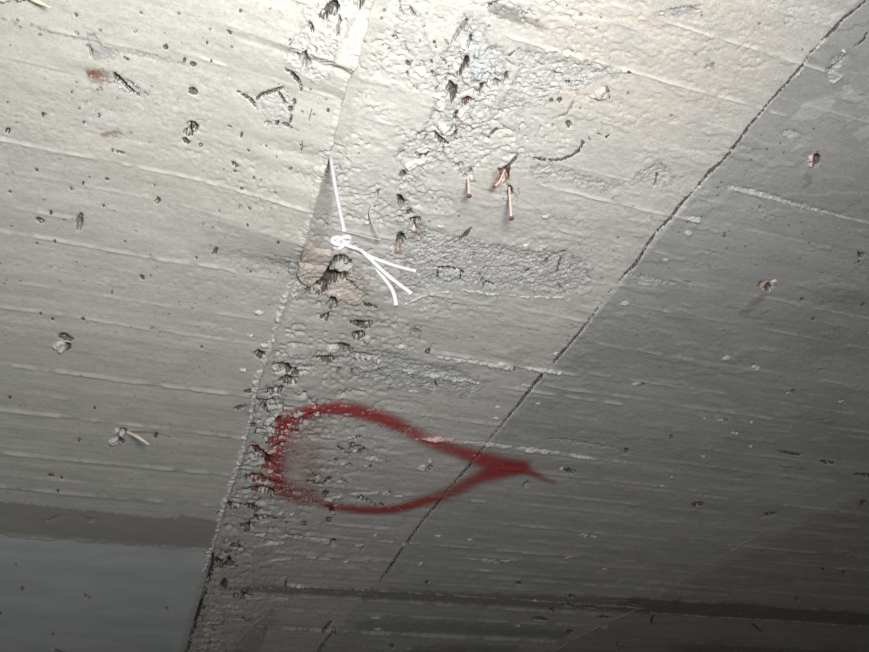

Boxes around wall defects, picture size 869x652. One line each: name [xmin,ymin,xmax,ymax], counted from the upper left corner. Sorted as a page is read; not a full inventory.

crack [379,0,868,581]